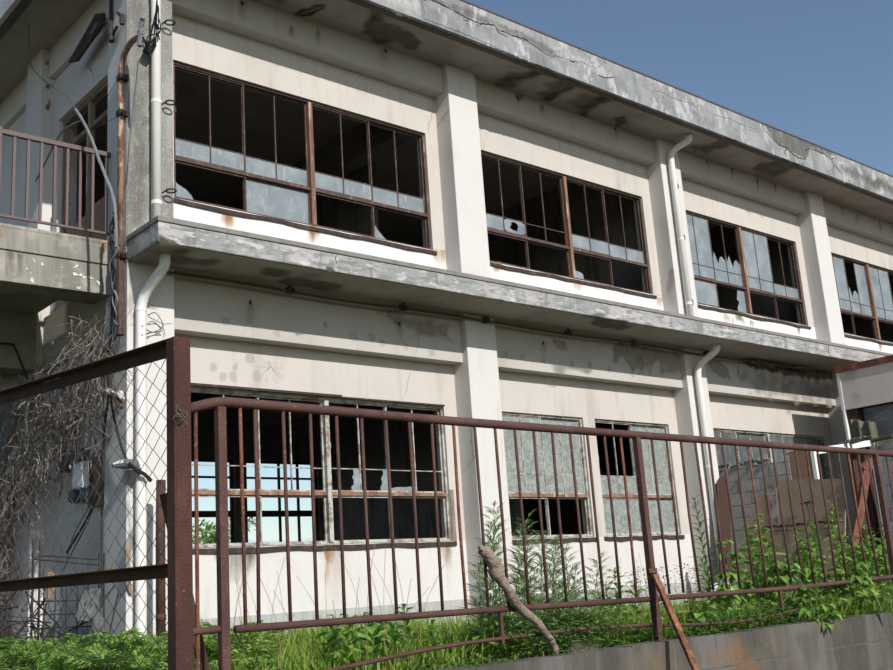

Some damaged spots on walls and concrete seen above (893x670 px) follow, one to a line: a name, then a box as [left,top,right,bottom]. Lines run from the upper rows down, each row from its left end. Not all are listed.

damp [364,13,420,50]
crack [421,0,613,78]
crack [642,85,843,177]
spalling [742,359,833,380]